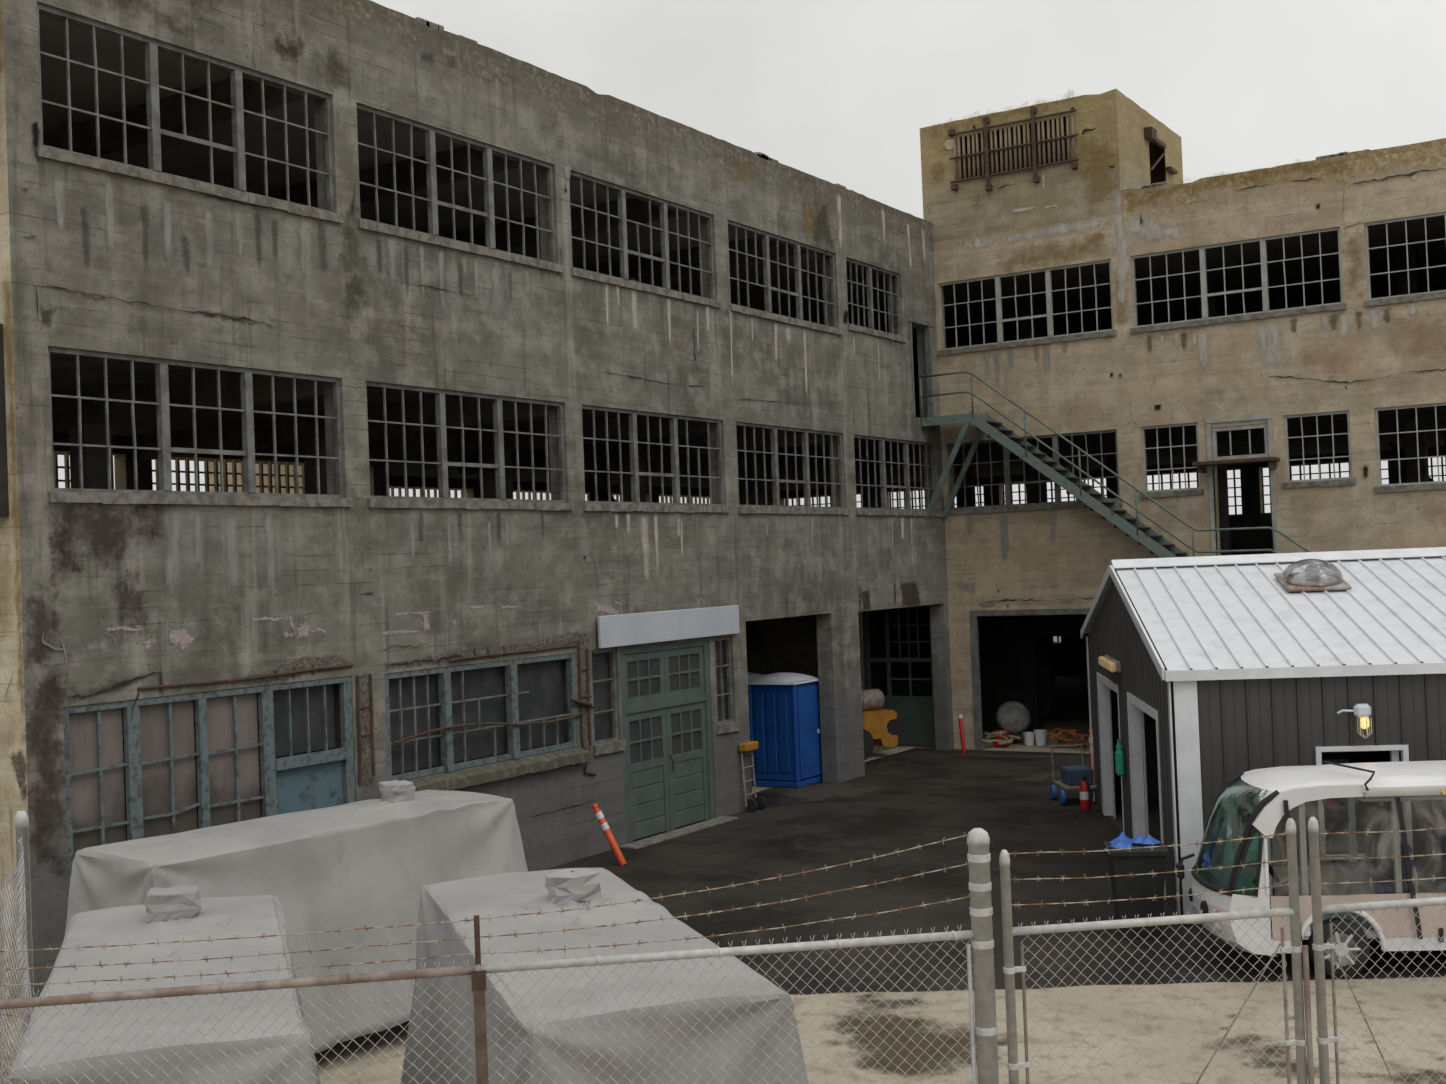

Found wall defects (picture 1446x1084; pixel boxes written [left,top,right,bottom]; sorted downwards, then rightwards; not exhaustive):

crack [36,286,284,328]
crack [1269,369,1446,390]